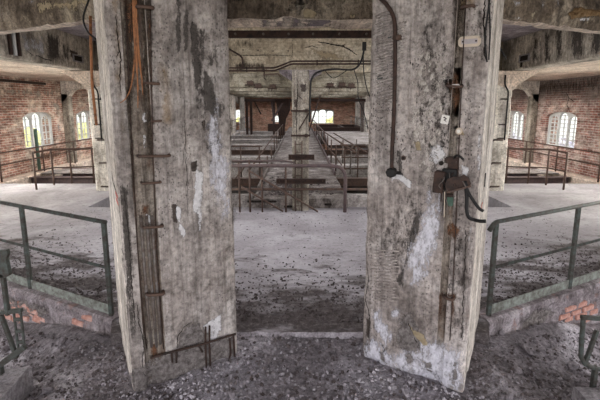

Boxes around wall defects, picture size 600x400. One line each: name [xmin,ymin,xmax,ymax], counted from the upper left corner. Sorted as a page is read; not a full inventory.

water stain [174,0,235,222]
rust [447,74,460,109]
peeling [430,144,448,164]
peeling [171,204,186,237]
peeling [190,160,203,230]
spalling [130,323,236,392]
spalling [396,313,430,364]